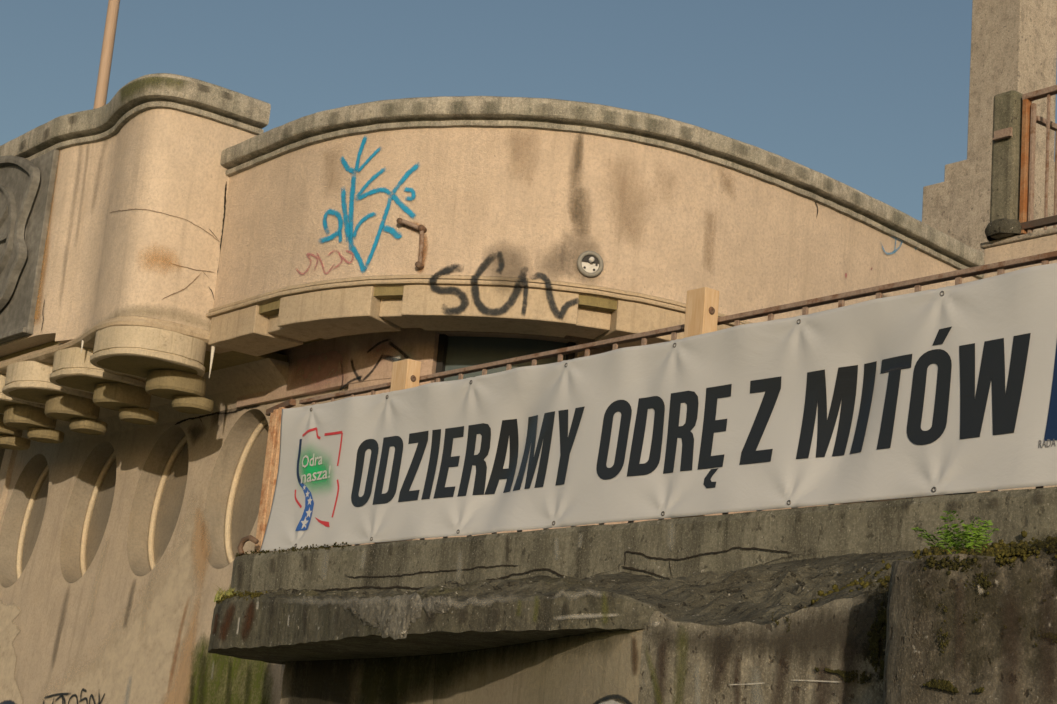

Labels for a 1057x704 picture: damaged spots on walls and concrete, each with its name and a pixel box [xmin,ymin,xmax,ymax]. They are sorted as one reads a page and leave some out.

crack [110,181,227,299]
crack [268,565,564,592]
crack [590,547,851,580]
water stain [690,601,883,704]